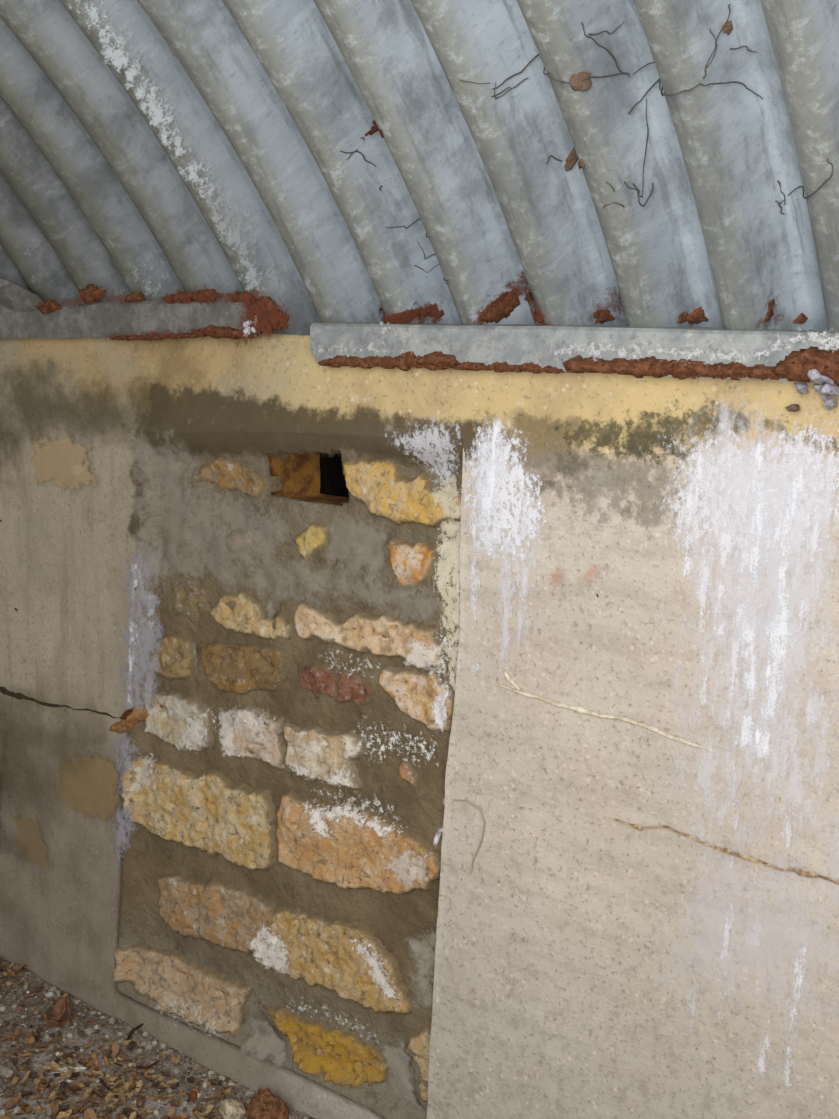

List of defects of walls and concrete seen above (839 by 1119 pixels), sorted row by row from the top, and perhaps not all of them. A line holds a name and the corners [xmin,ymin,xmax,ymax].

corrosion [34,284,289,345]
corrosion [378,302,444,324]
corrosion [468,270,548,326]
corrosion [677,306,709,325]
corrosion [318,351,783,380]
damp [120,385,547,768]
damp [555,401,839,848]
crack [0,687,117,718]
damp [281,764,407,840]
crack [613,818,839,885]
damp [248,922,292,974]
damp [349,938,400,1000]